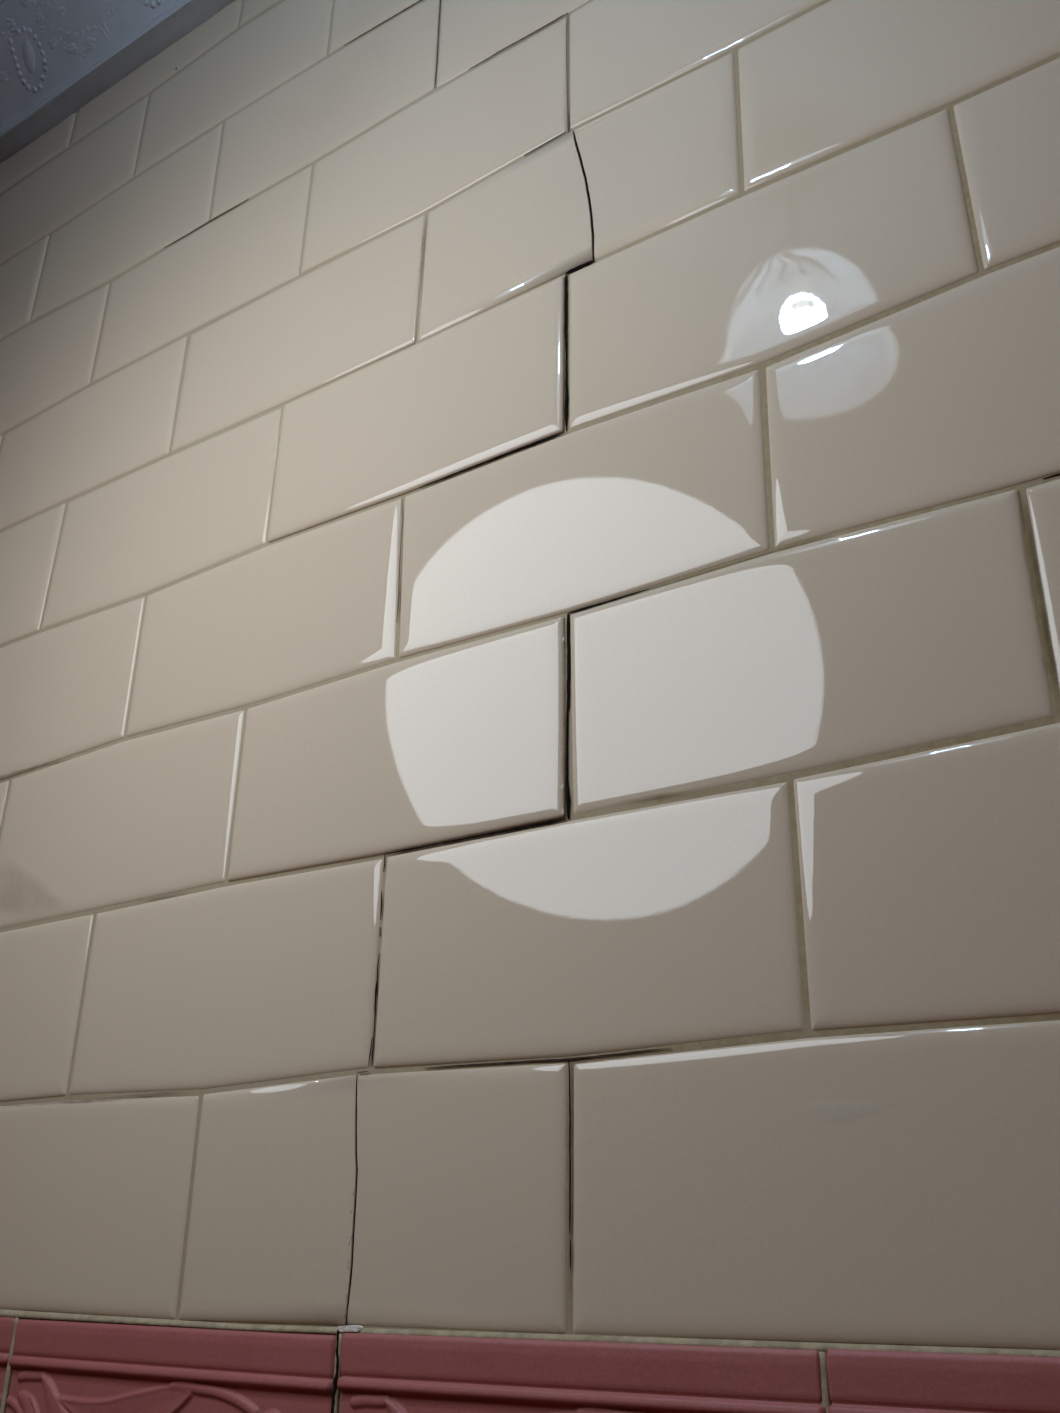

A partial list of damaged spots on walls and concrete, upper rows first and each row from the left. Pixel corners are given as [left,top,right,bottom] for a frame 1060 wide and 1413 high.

crack [344,0,594,623]
crack [331,589,670,1413]